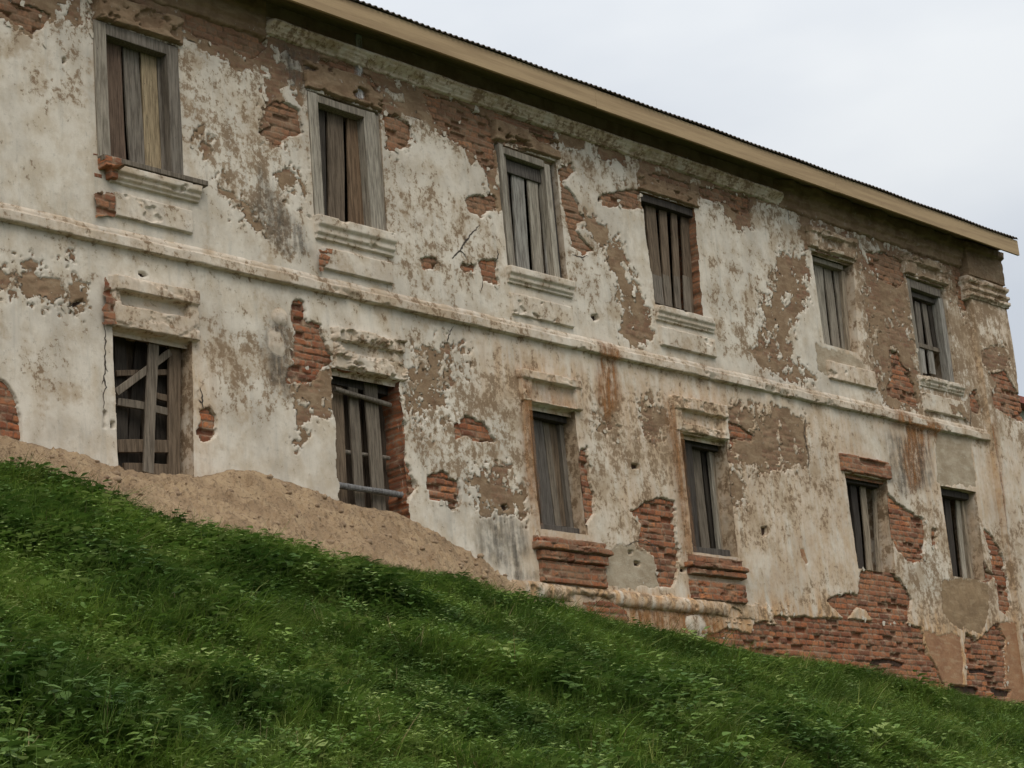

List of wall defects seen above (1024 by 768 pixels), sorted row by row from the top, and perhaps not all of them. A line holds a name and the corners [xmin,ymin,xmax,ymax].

flaking render [0,0,102,48]
flaking render [128,0,776,350]
flaking render [0,248,117,325]
crack [101,324,109,408]
flaking render [285,296,333,455]
flaking render [400,333,493,445]
crack [452,225,480,259]
flaking render [748,215,966,412]
flaking render [726,399,810,507]
flaking render [628,498,683,587]
flaking render [887,495,938,563]
flaking render [695,531,1009,702]